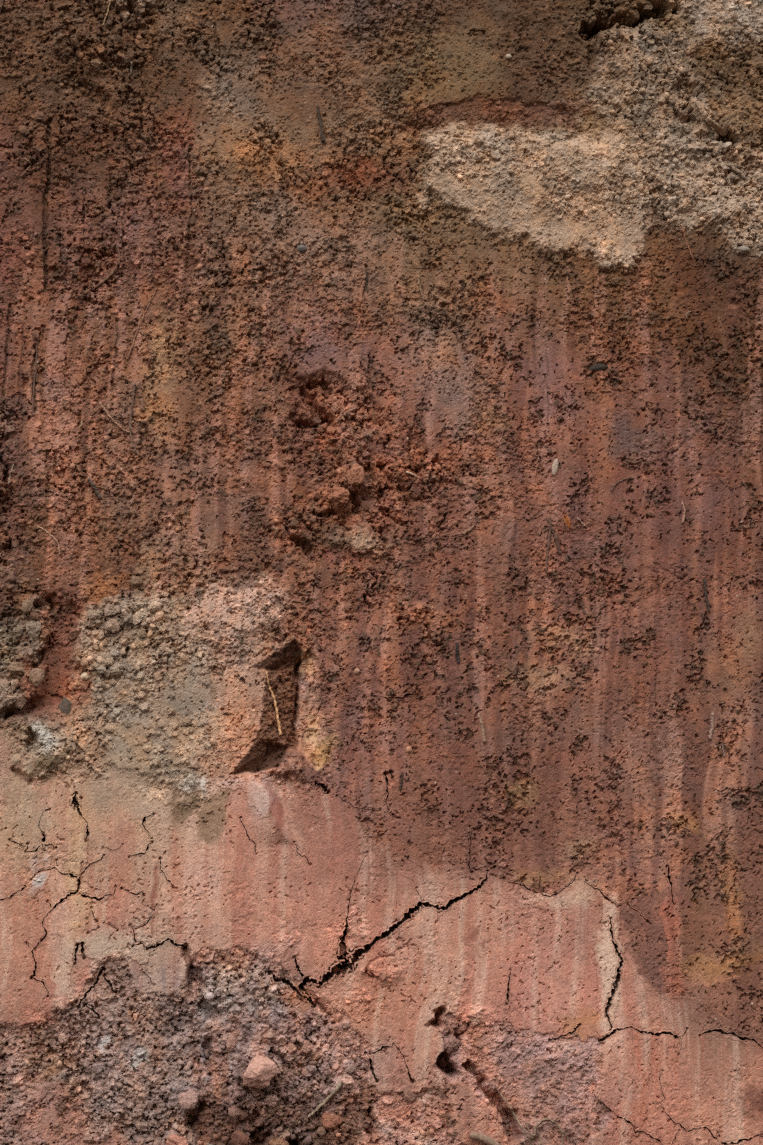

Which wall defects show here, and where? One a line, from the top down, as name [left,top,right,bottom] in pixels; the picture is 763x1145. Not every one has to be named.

spalling [0,569,54,718]
crack [0,794,185,996]
crack [77,968,116,1017]
spalling [0,958,198,1145]
crack [270,829,763,1145]